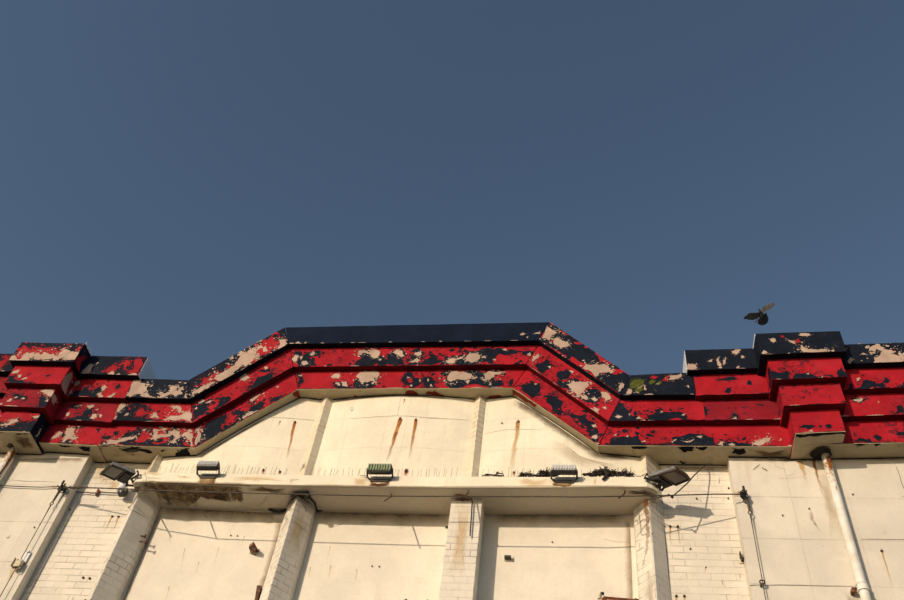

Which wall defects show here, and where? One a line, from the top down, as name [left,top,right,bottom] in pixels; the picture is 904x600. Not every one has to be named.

peeling [0,322,781,464]
peeling [762,332,904,404]
peeling [796,424,904,446]
damp [143,482,280,503]